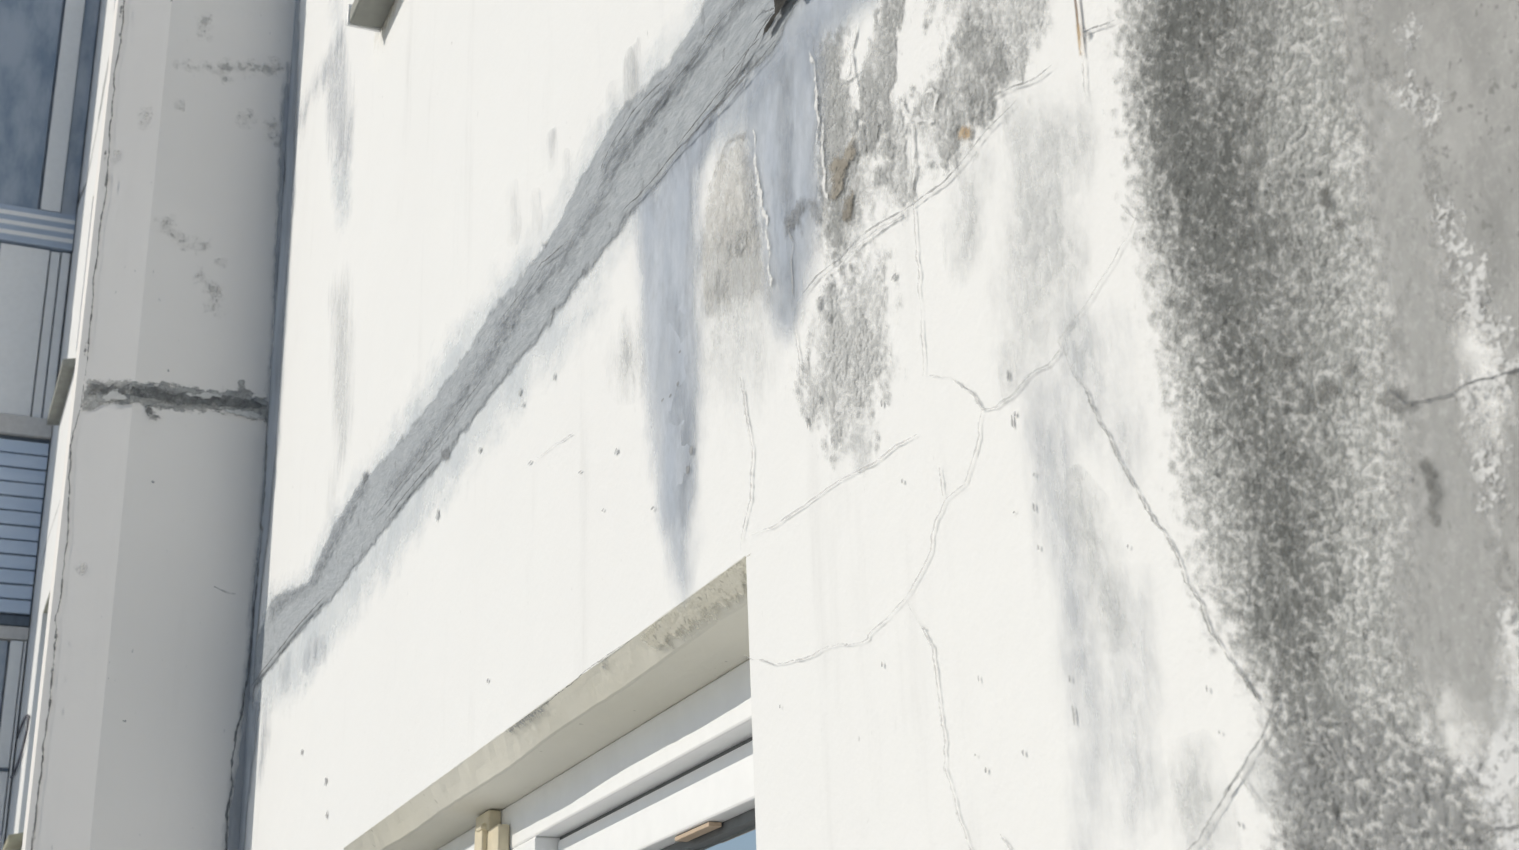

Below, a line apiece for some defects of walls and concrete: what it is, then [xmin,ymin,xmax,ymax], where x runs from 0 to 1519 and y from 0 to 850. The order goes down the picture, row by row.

leakage [947,0,1044,133]
leakage [703,134,774,313]
leakage [796,253,896,461]
crack [782,434,917,520]
crack [921,315,1078,456]
leakage [1114,0,1510,850]
crack [225,415,322,850]
crack [1085,389,1336,850]